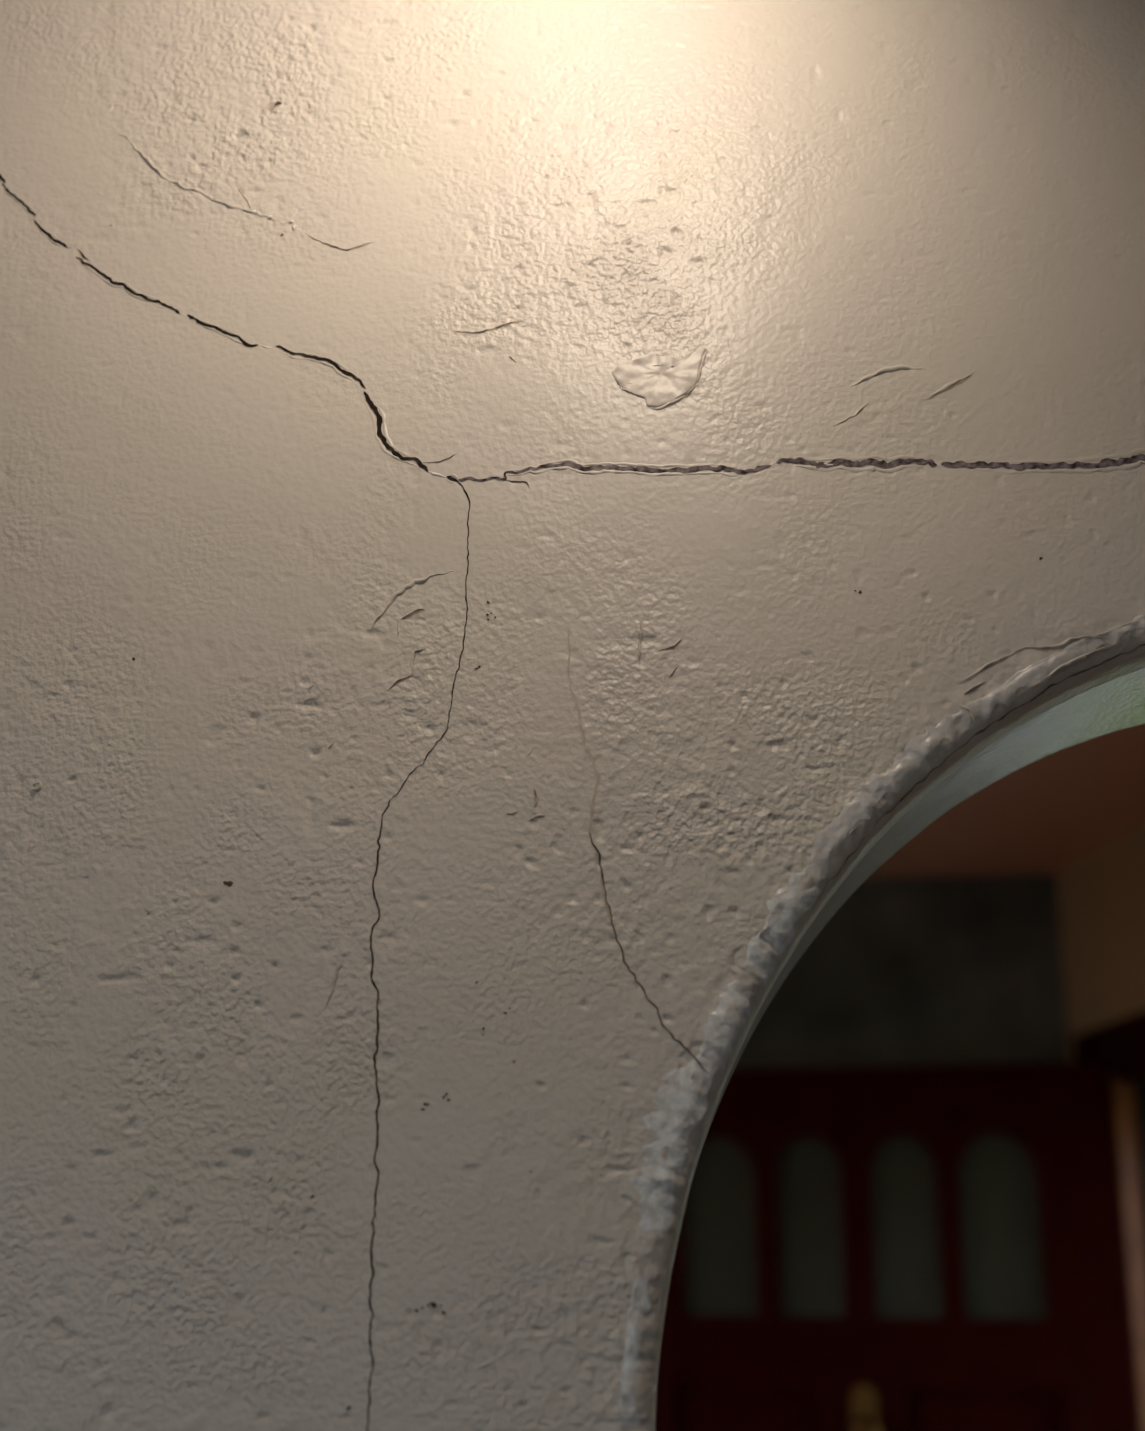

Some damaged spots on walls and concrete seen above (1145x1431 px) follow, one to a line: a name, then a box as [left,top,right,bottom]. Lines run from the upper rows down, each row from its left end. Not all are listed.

crack [0,174,68,248]
crack [76,249,1145,1431]
peeling [629,614,1145,1239]
peeling [620,1276,651,1426]